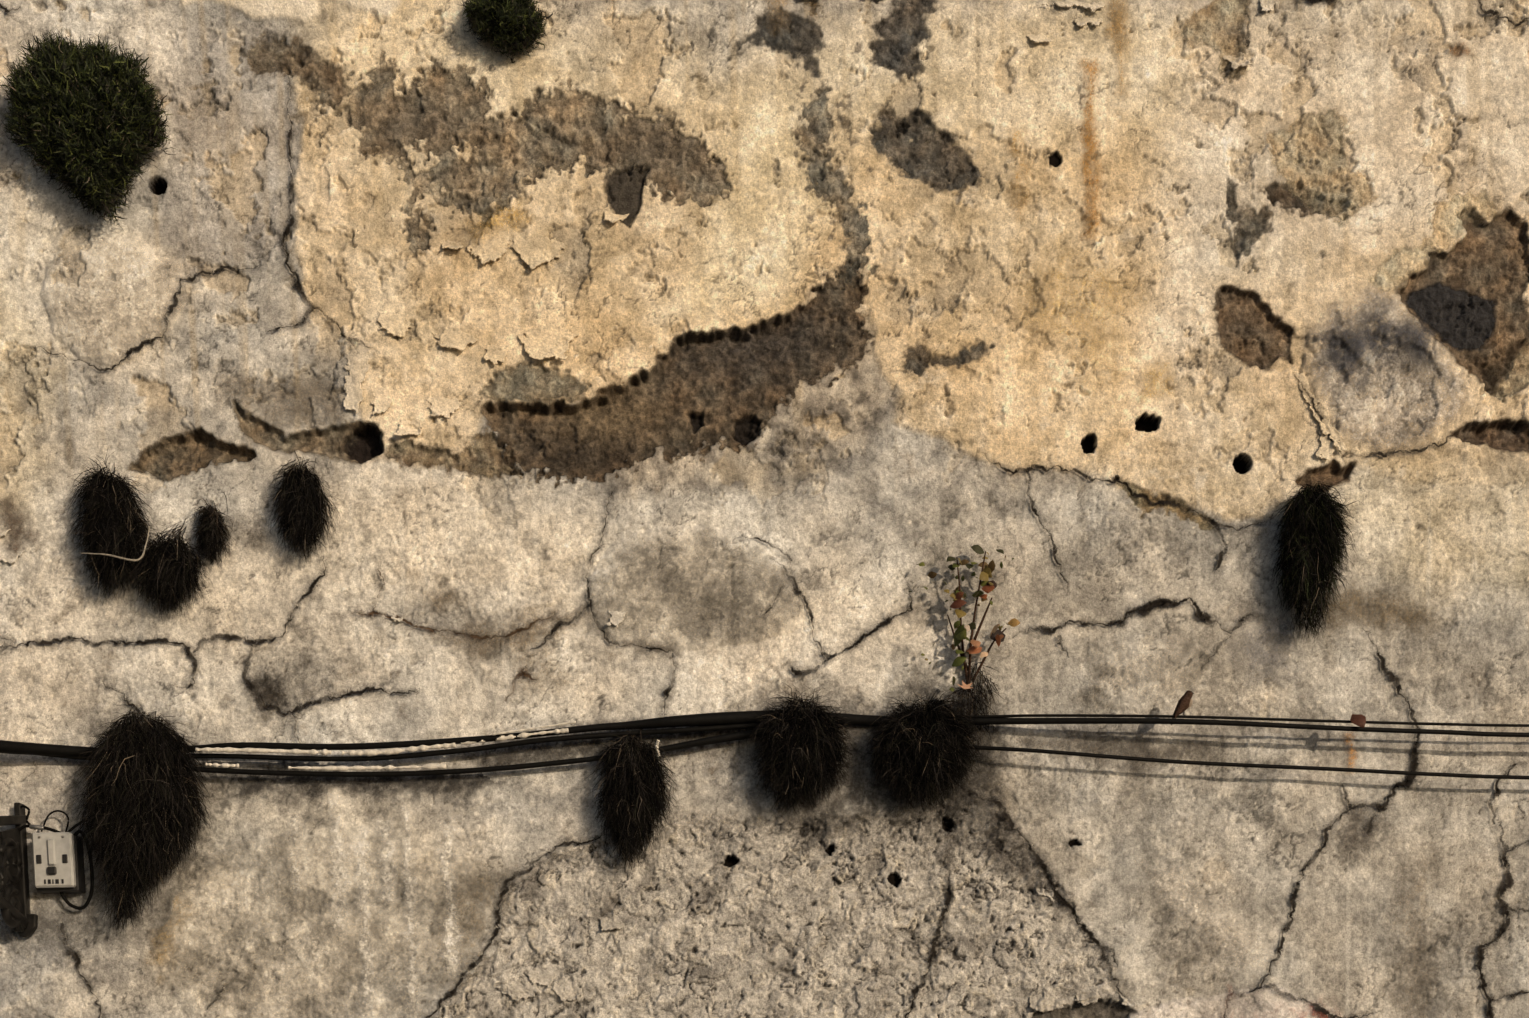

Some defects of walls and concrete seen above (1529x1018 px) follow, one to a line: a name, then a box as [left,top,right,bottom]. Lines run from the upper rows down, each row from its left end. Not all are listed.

spalling [869,0,935,77]
spalling [129,7,877,488]
spalling [871,109,982,192]
rust [1083,62,1098,237]
spalling [1215,285,1357,493]
spalling [1371,189,1529,452]
crack [0,486,676,743]
crack [743,536,913,676]
crack [979,452,1268,668]
spalling [439,803,1136,1018]
crack [1223,628,1420,1018]
crack [1476,763,1529,1018]